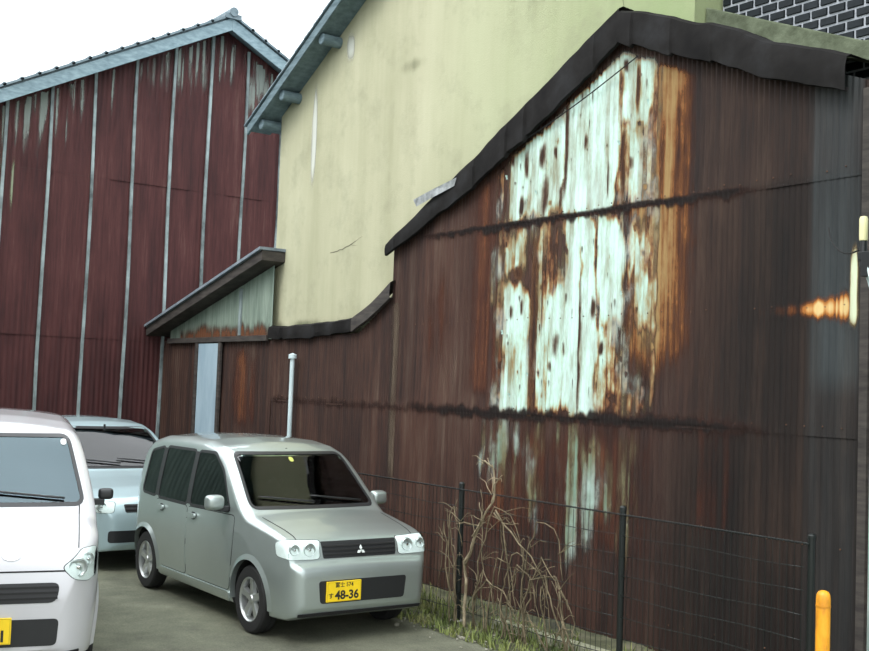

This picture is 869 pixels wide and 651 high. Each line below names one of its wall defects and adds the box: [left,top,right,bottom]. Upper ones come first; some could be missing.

corrosion [273,290,745,549]
peeling [479,51,663,562]
corrosion [426,60,747,392]
corrosion [801,293,850,320]